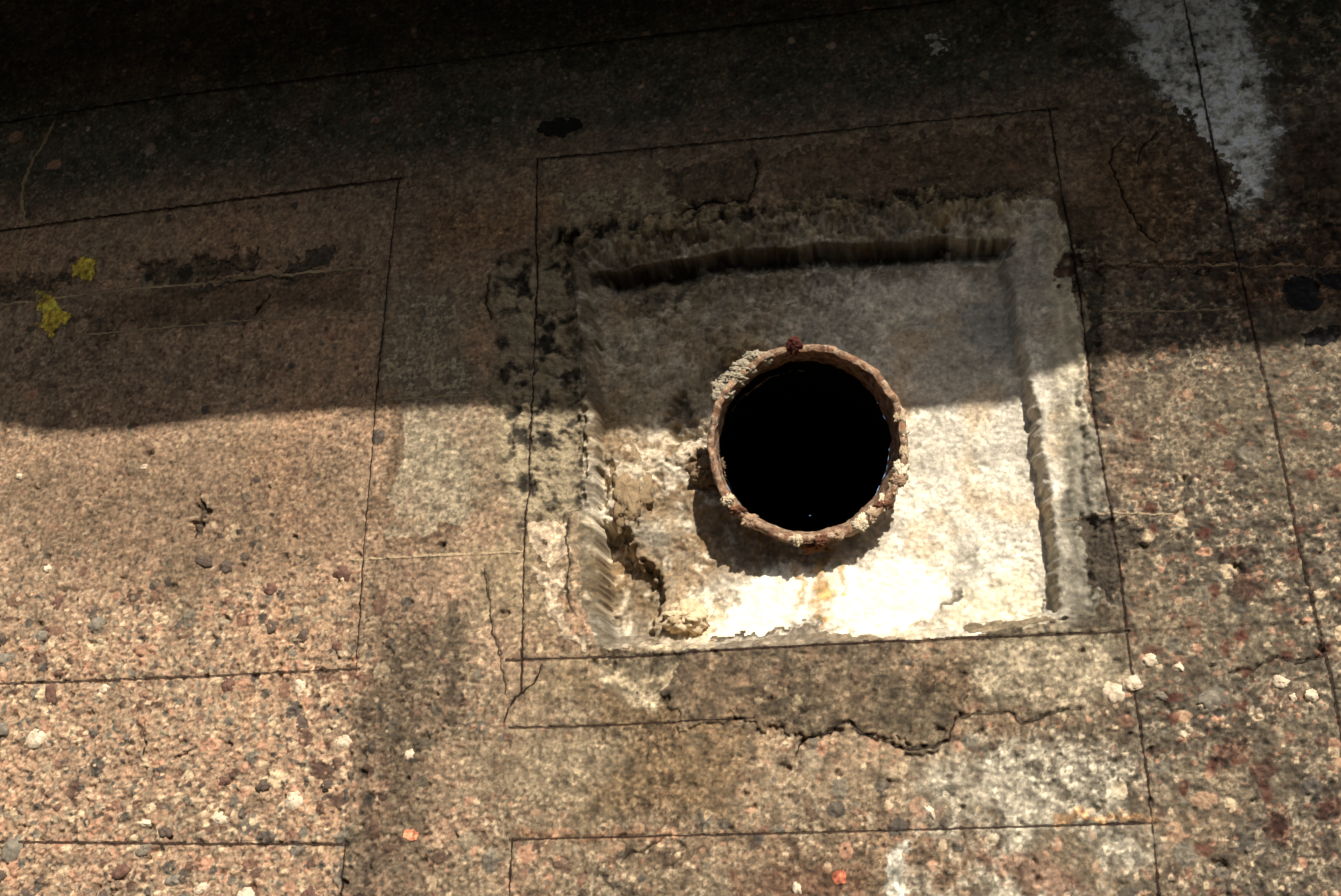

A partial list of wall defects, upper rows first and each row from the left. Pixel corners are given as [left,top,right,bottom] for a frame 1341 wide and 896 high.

peeling [487,183,1034,755]
corrosion [720,493,759,529]
corrosion [790,473,909,628]
peeling [963,616,1055,642]
crack [796,707,1083,754]